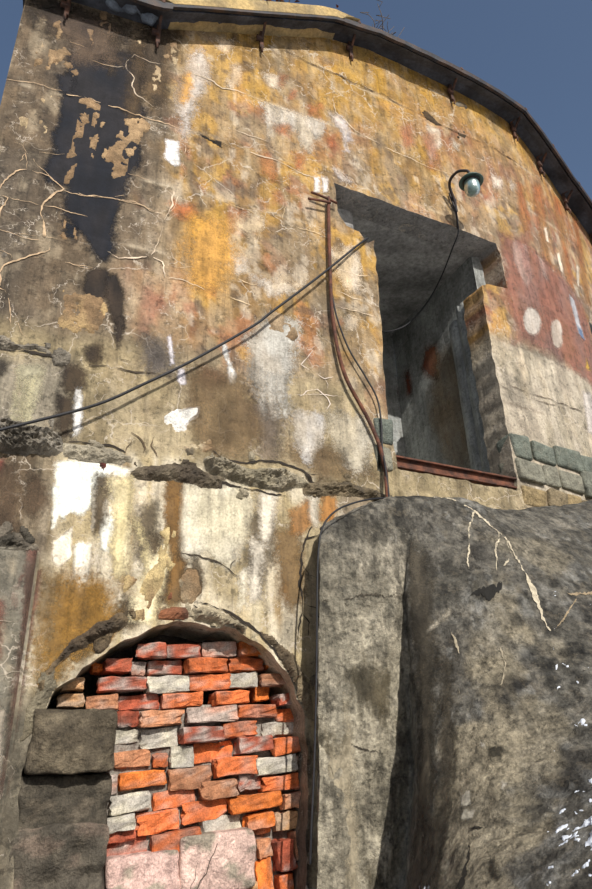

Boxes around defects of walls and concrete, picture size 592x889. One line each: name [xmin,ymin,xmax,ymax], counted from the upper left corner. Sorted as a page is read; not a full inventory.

flaking render [34,20,78,75]
flaking render [152,42,180,91]
flaking render [64,98,151,184]
water stain [25,0,211,347]
crack [0,54,312,357]
spalling [0,417,63,456]
water stain [53,344,104,441]
spalling [130,439,226,489]
spalling [0,521,38,552]
crack [434,497,592,631]
spalling [20,526,247,741]
spalling [261,632,318,721]